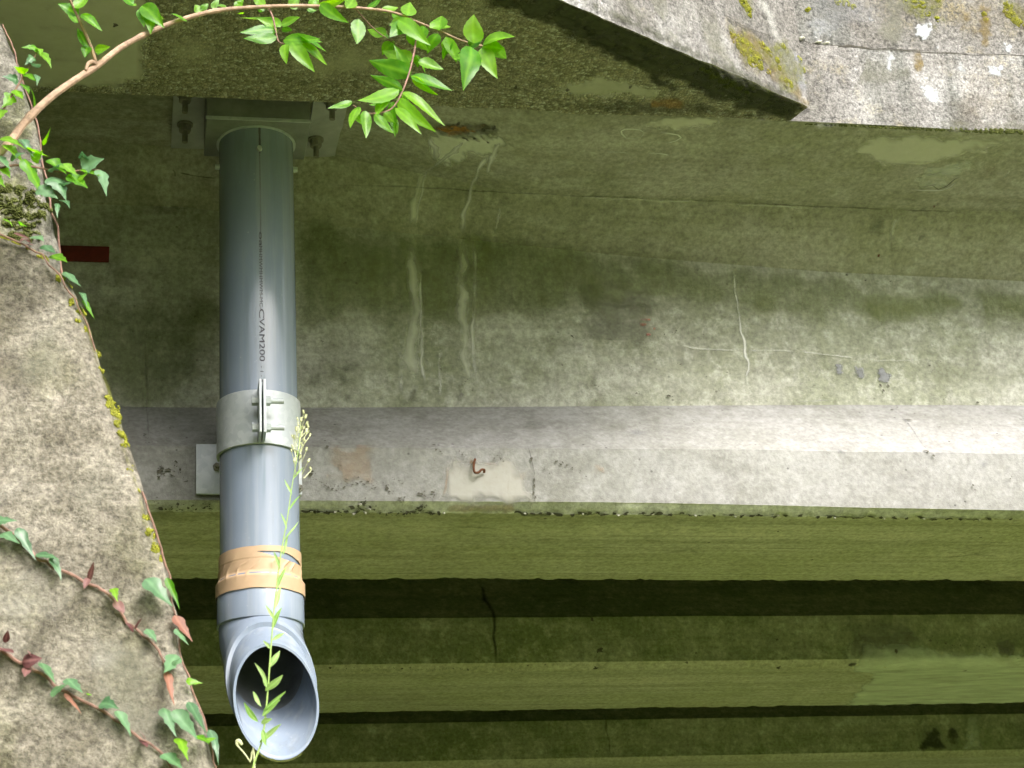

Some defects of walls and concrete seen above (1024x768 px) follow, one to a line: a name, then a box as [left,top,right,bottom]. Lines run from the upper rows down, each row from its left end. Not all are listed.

efflorescence [426,130,505,225]
efflorescence [405,257,424,376]
efflorescence [459,286,474,373]
crack [734,280,749,373]
crack [482,588,496,654]